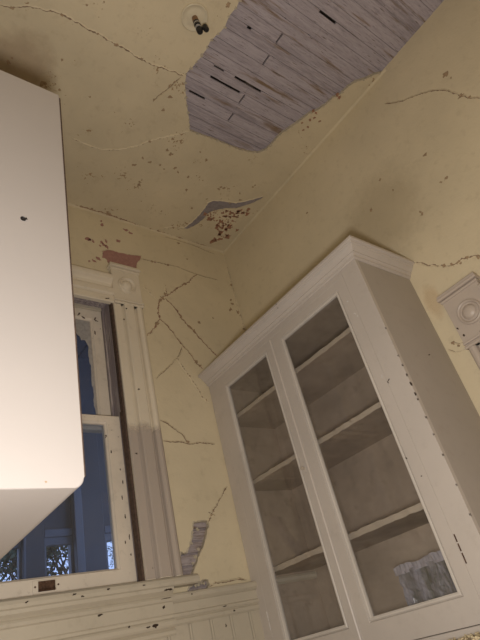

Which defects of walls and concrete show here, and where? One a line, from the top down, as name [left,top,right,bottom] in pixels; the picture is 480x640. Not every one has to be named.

crack [0,4,184,102]
flaking render [183,0,444,154]
crack [385,88,480,104]
peeling [163,193,264,244]
peeling [85,237,141,268]
crack [414,255,480,268]
crack [143,258,244,402]
crack [161,420,214,445]
crack [207,487,227,523]
flaking render [180,520,209,575]